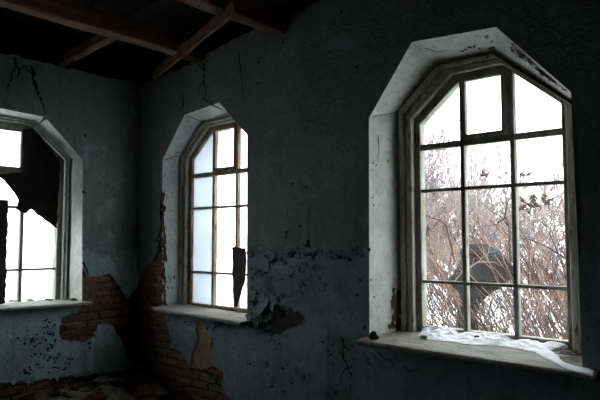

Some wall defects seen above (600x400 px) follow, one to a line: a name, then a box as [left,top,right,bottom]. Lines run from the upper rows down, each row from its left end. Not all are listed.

crack [7,57,46,125]
spalling [0,191,235,400]
peeling [244,240,371,339]
spalling [388,288,401,331]
crack [340,337,352,391]